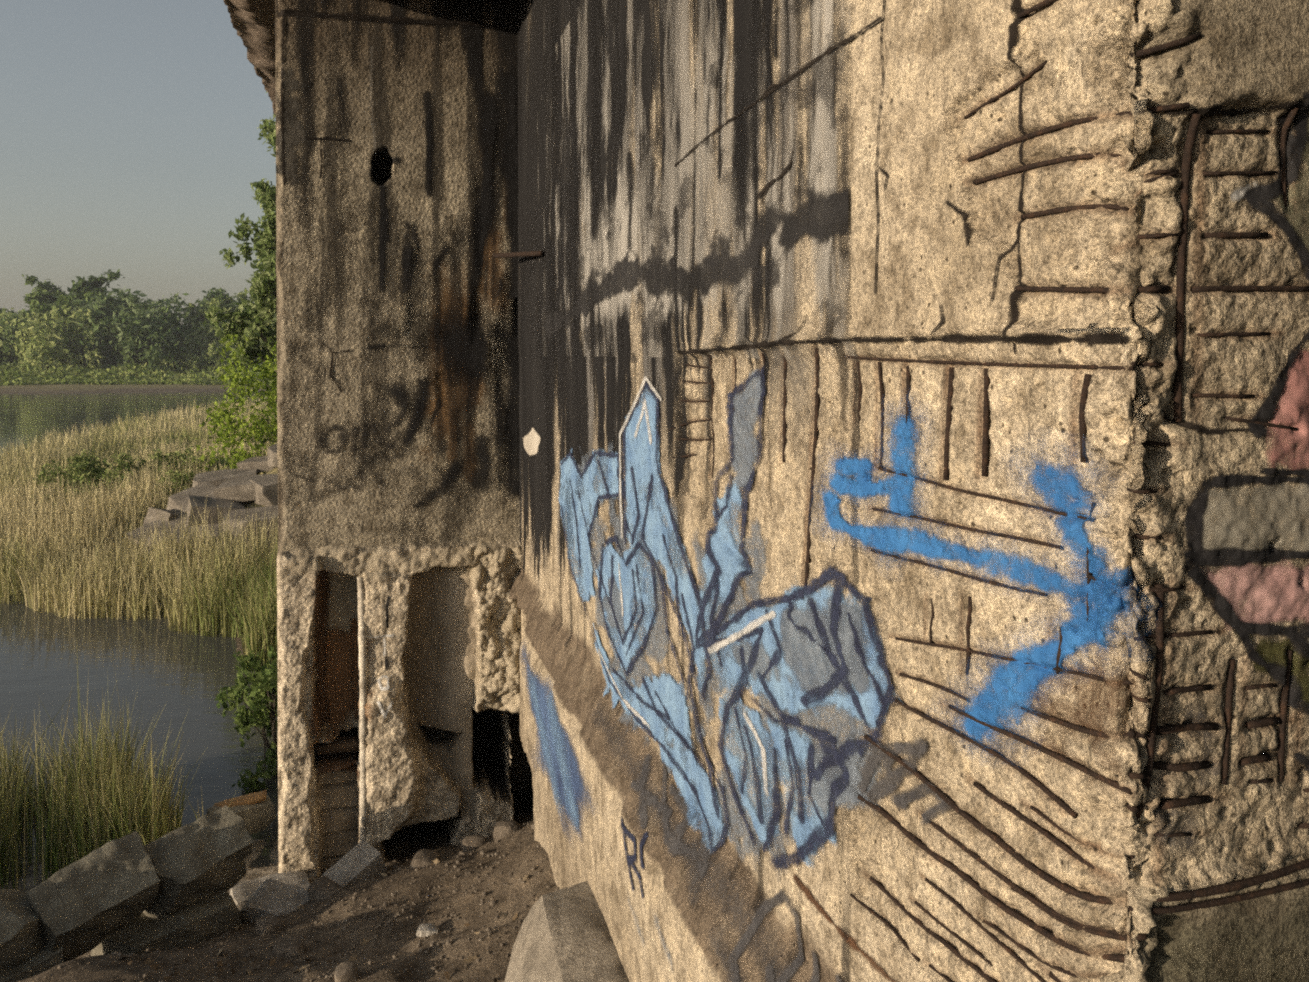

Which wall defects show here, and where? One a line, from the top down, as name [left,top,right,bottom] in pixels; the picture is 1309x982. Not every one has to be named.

water stain [293,28,342,317]
water stain [362,22,527,511]
water stain [526,0,836,546]
spalling [317,767,360,873]
spalling [280,537,522,826]